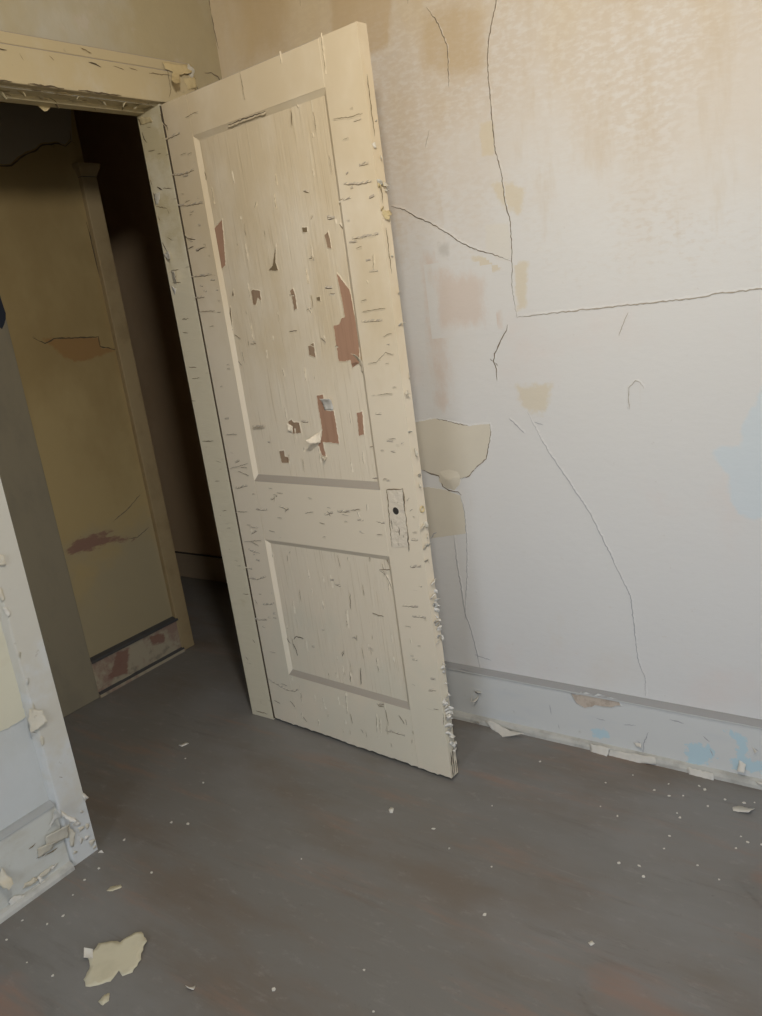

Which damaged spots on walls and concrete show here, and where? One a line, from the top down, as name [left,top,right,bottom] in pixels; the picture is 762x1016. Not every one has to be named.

crack [0,80,121,96]
crack [82,0,762,424]
crack [33,336,115,350]
peeling [36,331,117,366]
peeling [63,524,138,560]
crack [424,412,648,696]
crack [206,407,489,755]
peeling [0,587,49,831]
spalling [570,692,623,709]
peeling [590,744,656,764]
peeling [687,767,714,780]
peeling [0,863,58,906]